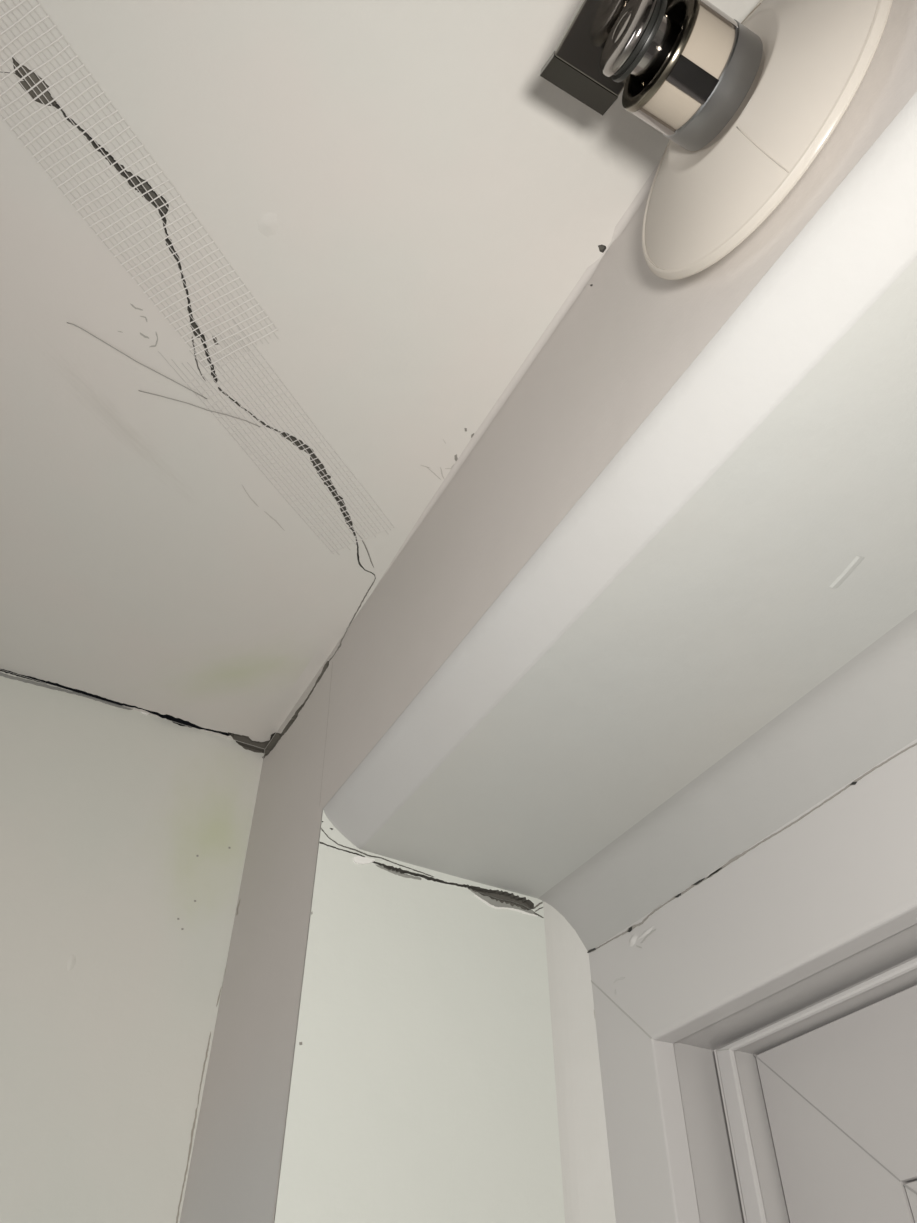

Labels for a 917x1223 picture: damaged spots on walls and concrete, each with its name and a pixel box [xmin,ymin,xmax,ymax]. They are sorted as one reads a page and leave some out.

crack [0,57,376,759]
crack [319,821,544,918]
crack [587,743,917,953]